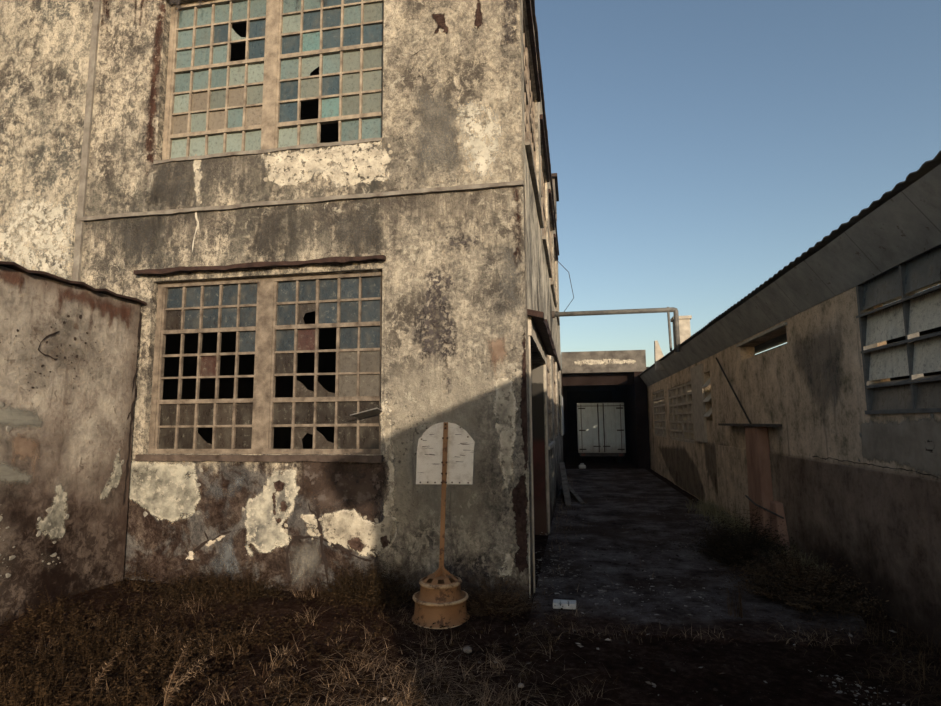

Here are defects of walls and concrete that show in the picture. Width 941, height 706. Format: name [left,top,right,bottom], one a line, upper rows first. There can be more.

corrosion [145,2,167,177]
peeling [261,141,393,188]
peeling [36,484,69,565]
peeling [100,448,203,522]
peeling [242,398,403,556]